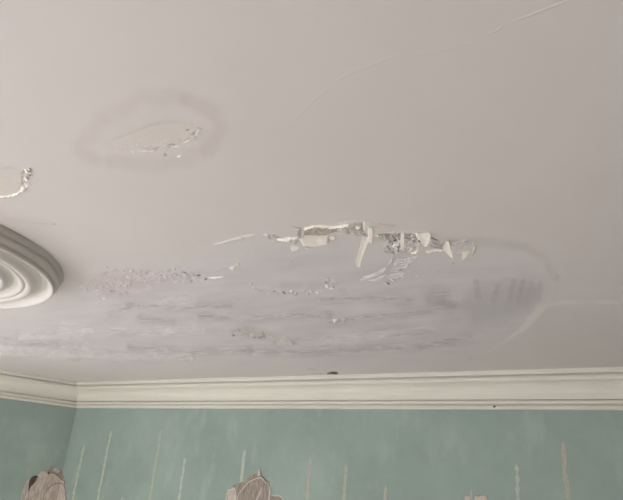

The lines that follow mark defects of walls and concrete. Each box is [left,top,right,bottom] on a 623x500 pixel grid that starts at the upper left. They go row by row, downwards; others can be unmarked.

peeling [0,166,33,198]
peeling [263,220,477,290]
water stain [0,232,557,374]